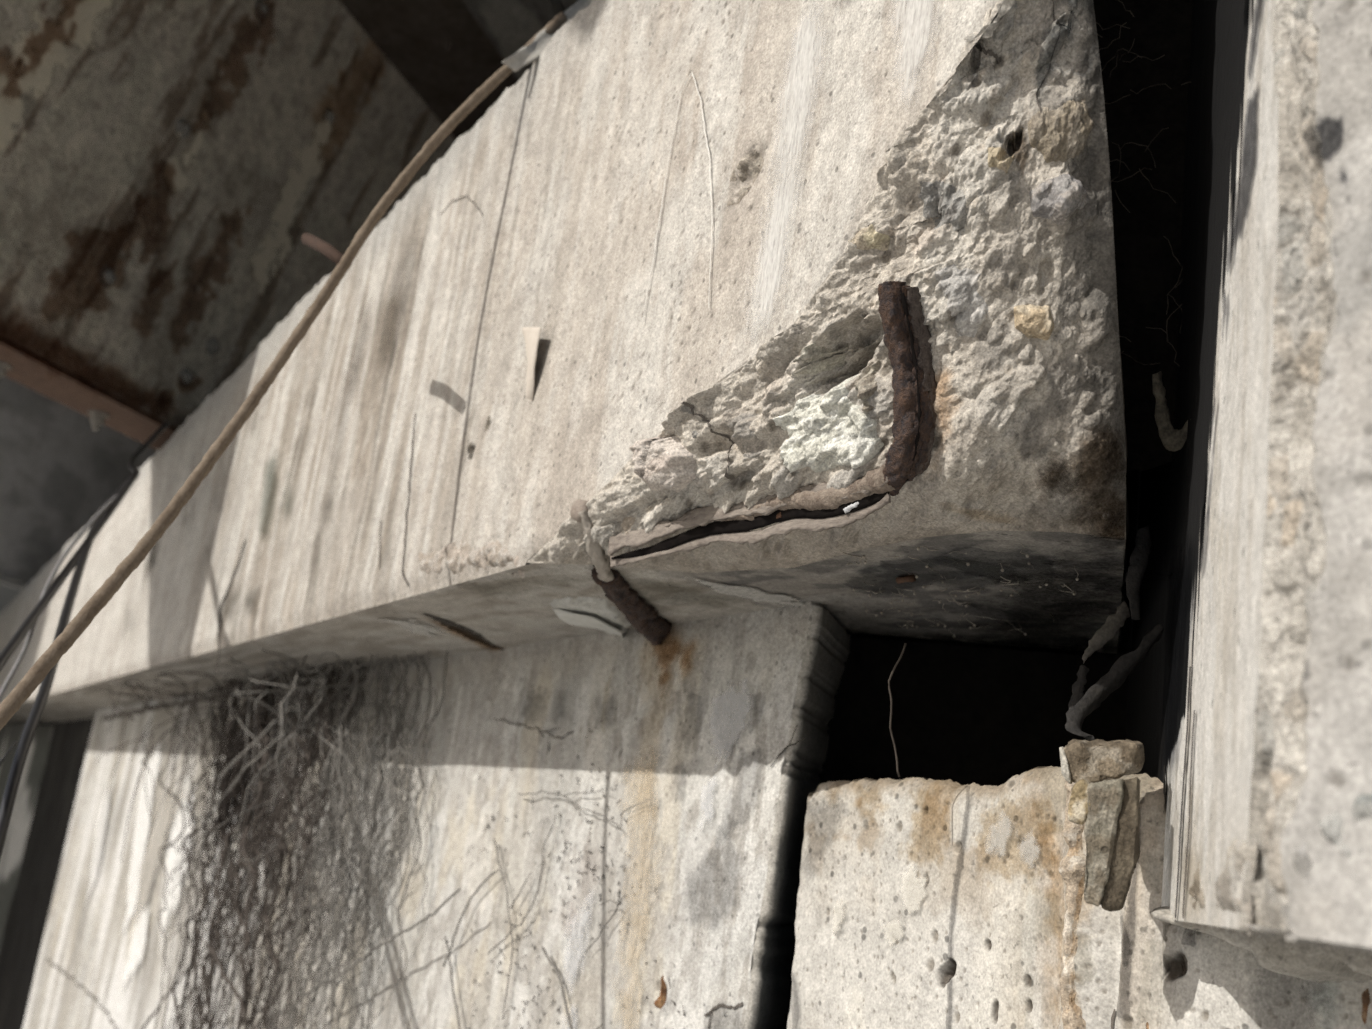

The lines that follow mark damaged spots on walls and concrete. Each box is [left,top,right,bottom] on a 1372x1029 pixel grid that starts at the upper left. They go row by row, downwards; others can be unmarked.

crack [379,413,502,650]
corrosion [570,281,937,646]
spalling [418,0,1126,607]
spalling [1059,746,1072,784]